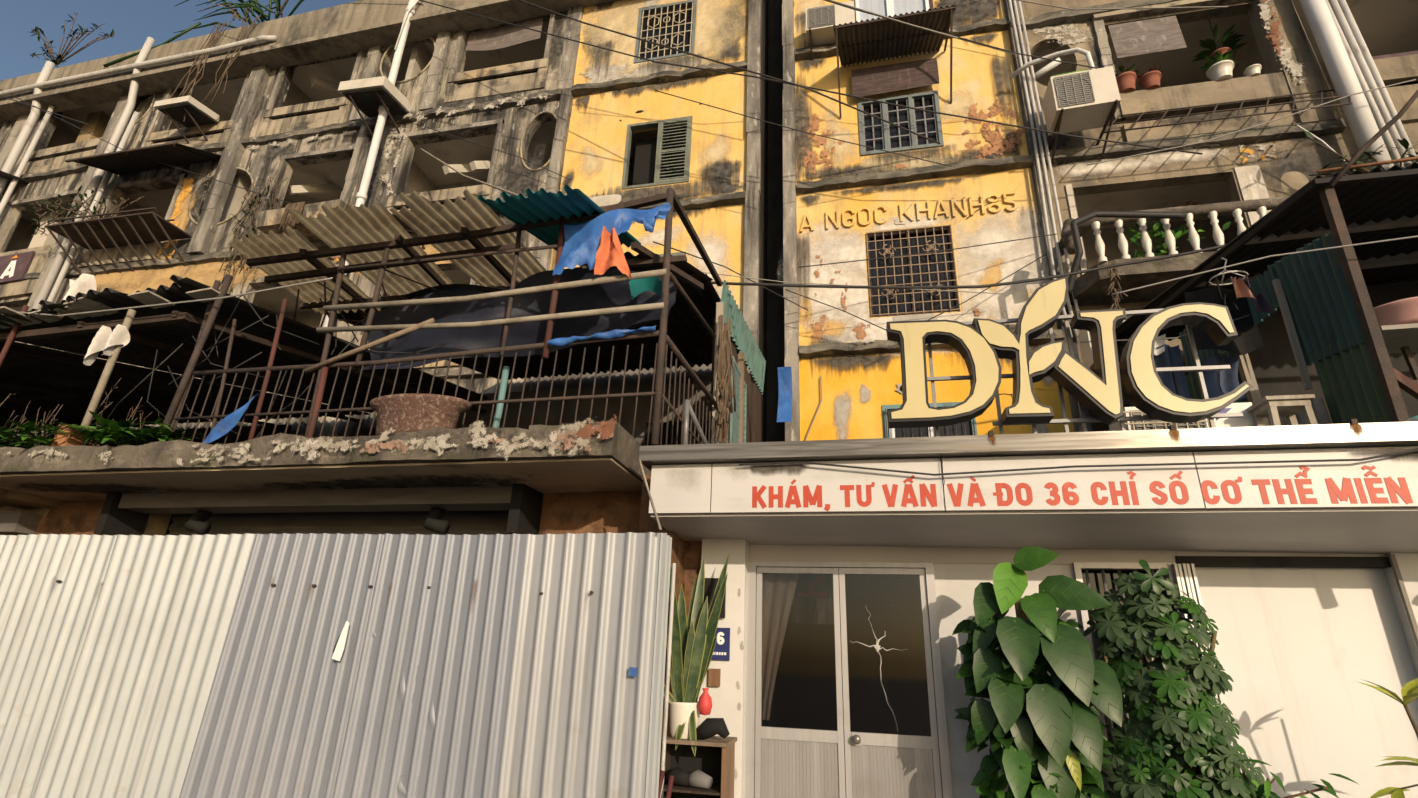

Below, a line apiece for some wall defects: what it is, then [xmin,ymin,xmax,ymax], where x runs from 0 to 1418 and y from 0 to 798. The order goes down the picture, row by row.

flaking render [1257,0,1309,85]
leakage [576,96,590,109]
peeling [801,113,947,182]
peeling [941,93,1026,159]
leakage [562,172,574,194]
leakage [595,161,739,216]
peeling [6,447,67,459]
peeling [176,416,617,466]